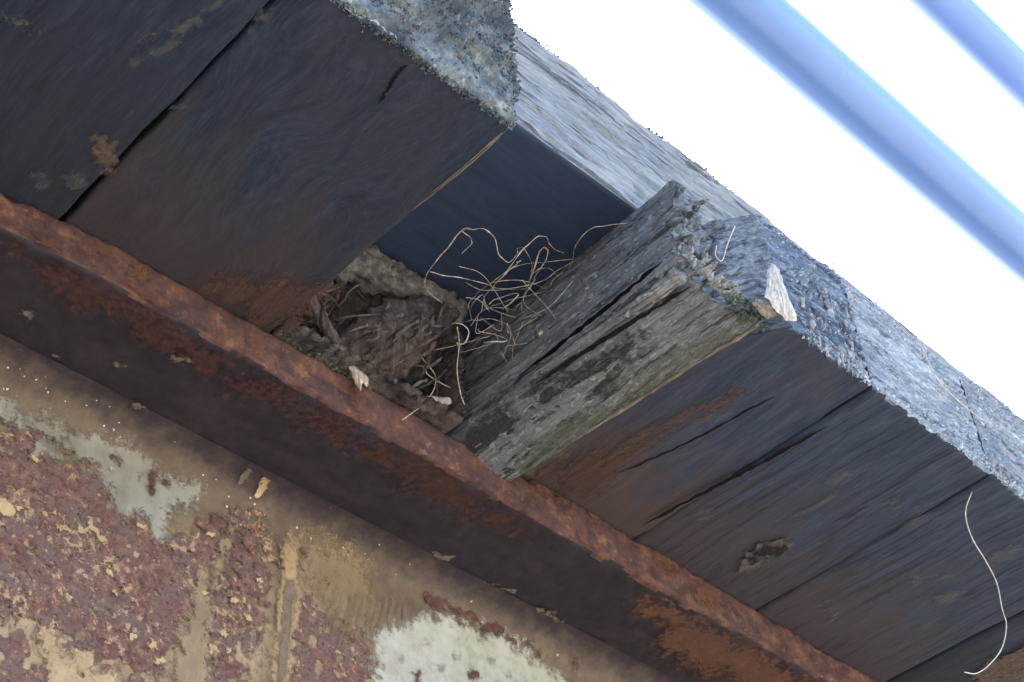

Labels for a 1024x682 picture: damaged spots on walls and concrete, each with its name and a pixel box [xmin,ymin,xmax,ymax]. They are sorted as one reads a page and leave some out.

crack [378,65,408,104]
crack [518,261,691,384]
peeling [0,396,204,543]
peeling [238,467,271,498]
crack [620,396,776,473]
crack [645,424,831,524]
corrosion [0,418,282,682]
peeling [35,626,132,682]
corrosion [287,589,375,682]
corrosion [423,591,540,659]
corrosion [633,591,832,682]